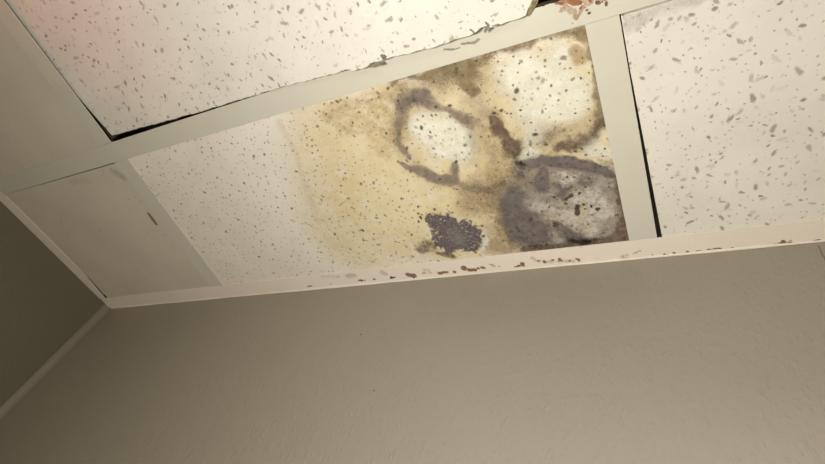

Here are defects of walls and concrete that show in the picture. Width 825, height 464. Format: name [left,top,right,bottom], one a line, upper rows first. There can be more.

corrosion [535,0,608,24]
damp [313,26,629,259]
corrosion [438,264,500,275]